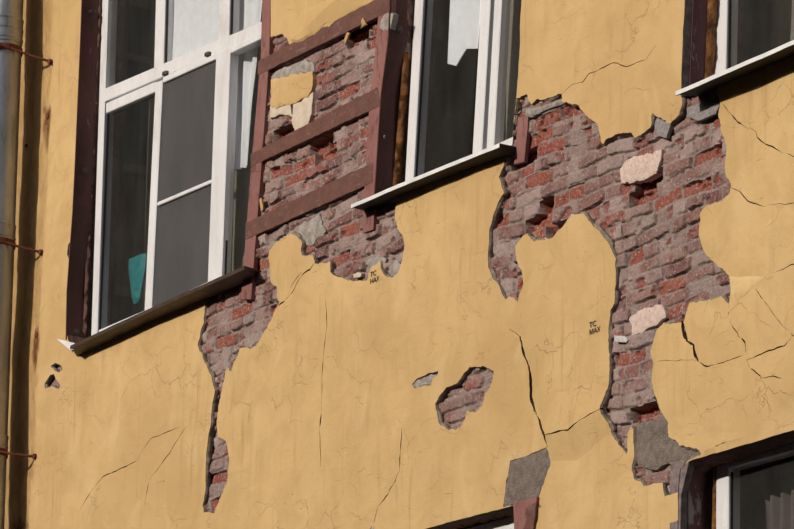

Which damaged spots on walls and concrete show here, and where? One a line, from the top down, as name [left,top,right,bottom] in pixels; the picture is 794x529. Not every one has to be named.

flaking render [265,13,399,145]
crack [562,45,656,94]
flaking render [259,114,369,216]
crack [722,103,794,157]
crack [732,188,793,207]
flaking render [45,363,62,389]
flaking render [198,189,404,513]
flaking render [435,366,494,430]
crack [509,329,603,444]
flaking render [488,89,765,496]
crack [662,292,794,378]
flaking render [502,448,551,510]